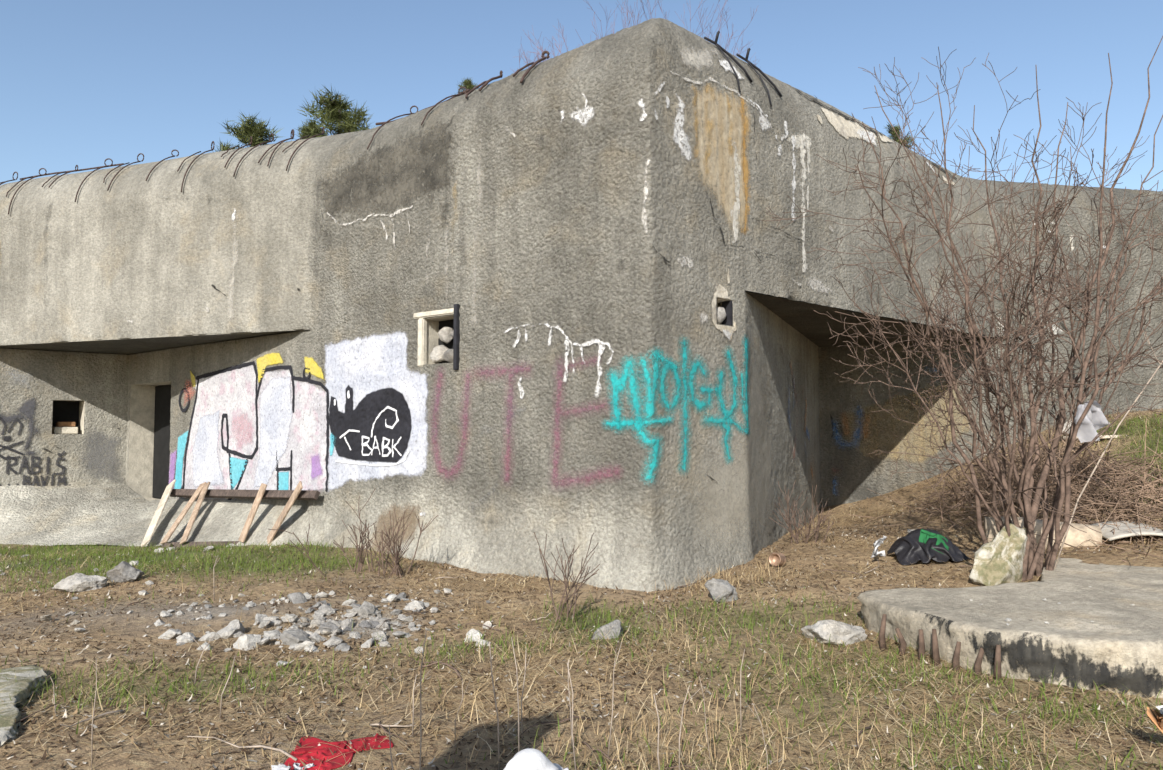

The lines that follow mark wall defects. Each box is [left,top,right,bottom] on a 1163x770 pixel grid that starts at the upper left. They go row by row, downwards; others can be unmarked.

peeling [642,160,650,233]
peeling [638,84,691,160]
corrosion [694,87,750,242]
water stain [671,49,831,293]
spalling [818,108,893,146]